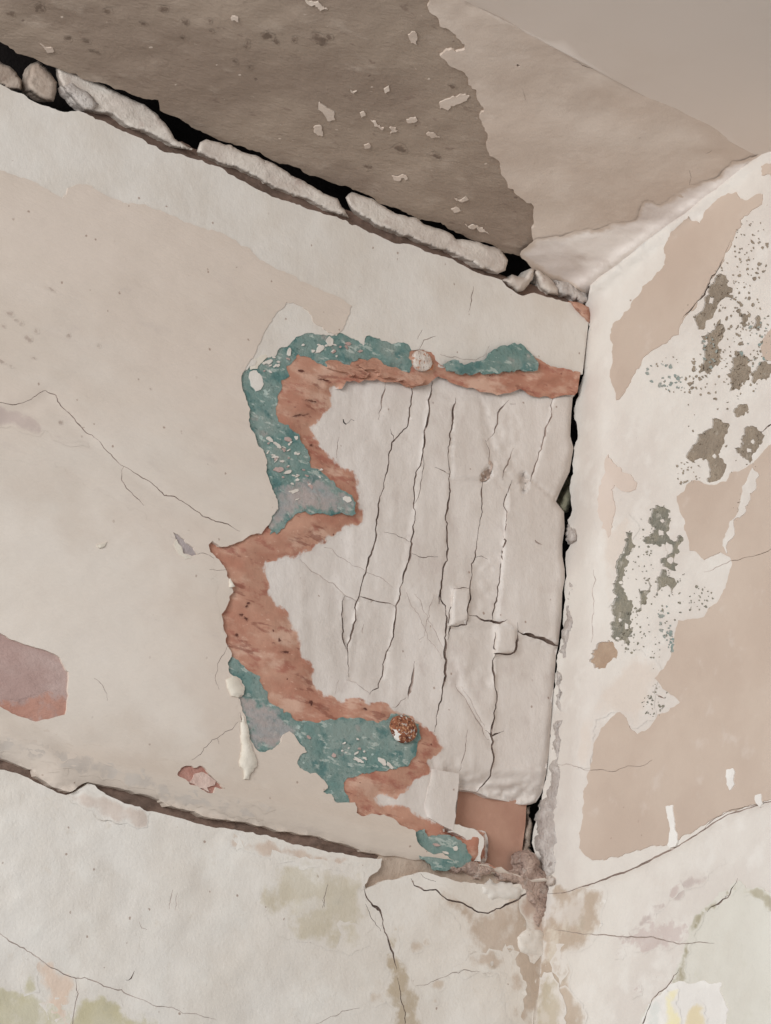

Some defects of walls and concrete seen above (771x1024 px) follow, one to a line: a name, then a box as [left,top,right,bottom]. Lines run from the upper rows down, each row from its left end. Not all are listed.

peeling [610,192,771,400]
crack [0,390,238,531]
peeling [0,84,589,888]
crack [335,382,559,789]
damp [594,512,640,607]
peeling [579,404,771,860]
crack [411,801,771,914]
crack [0,933,212,1024]
crack [364,889,479,1023]